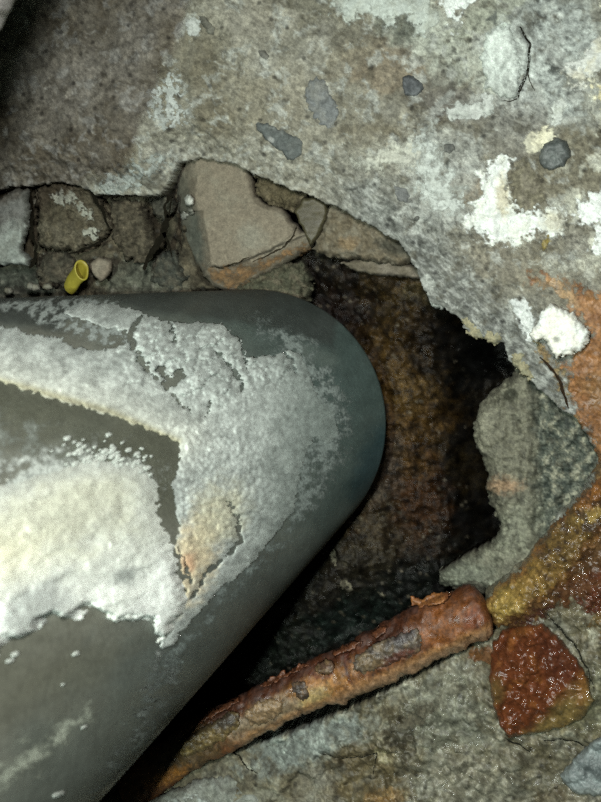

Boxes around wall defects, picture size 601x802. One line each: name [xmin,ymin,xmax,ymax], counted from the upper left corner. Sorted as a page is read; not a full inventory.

water stain [328,0,476,38]
crack [503,26,535,102]
water stain [561,36,601,100]
water stain [443,92,494,121]
water stain [523,98,568,154]
spalling [293,196,329,246]
water stain [349,119,601,282]
corrosion [468,270,601,738]
corrosion [410,591,452,608]
corrosion [260,661,309,687]
corrosion [185,696,283,732]